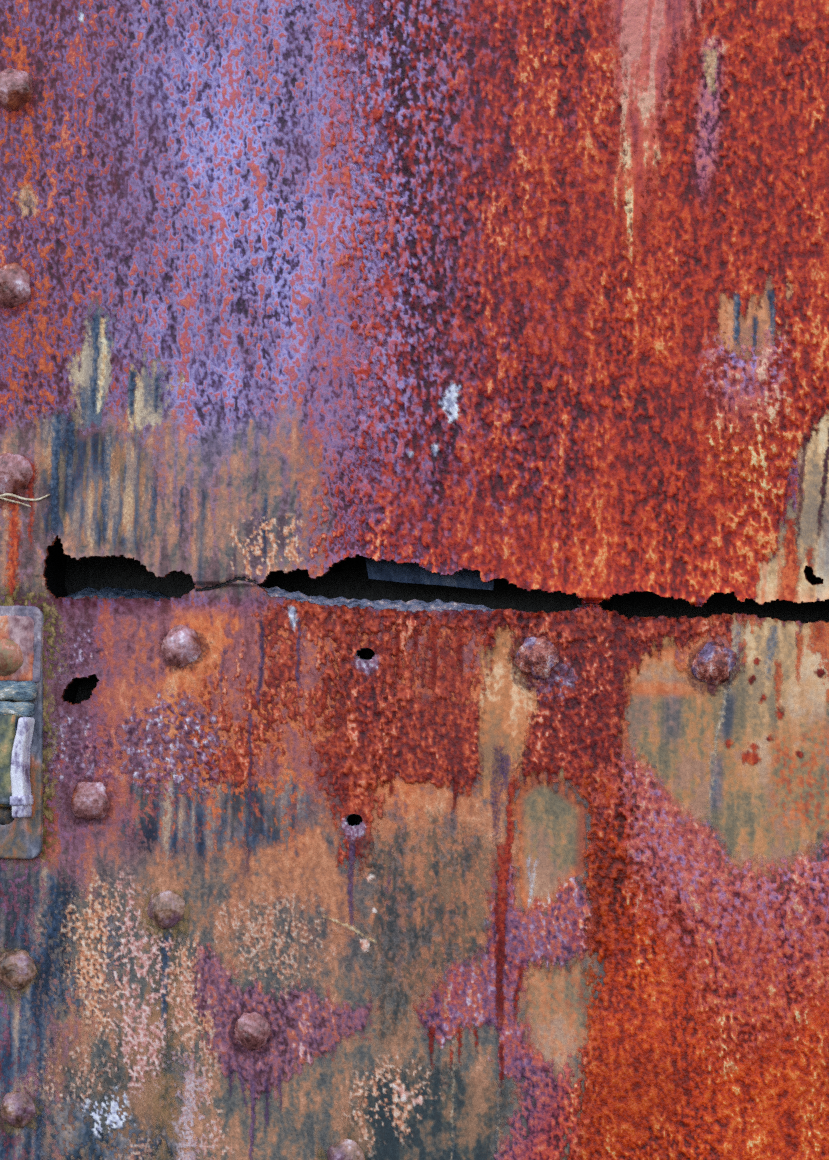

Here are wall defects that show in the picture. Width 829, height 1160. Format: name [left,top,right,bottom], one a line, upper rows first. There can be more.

corrosion [0,14,53,221]
corrosion [0,246,78,418]
crack [43,535,829,624]
corrosion [166,0,829,1160]
peeling [756,412,829,604]
peeling [623,613,829,865]